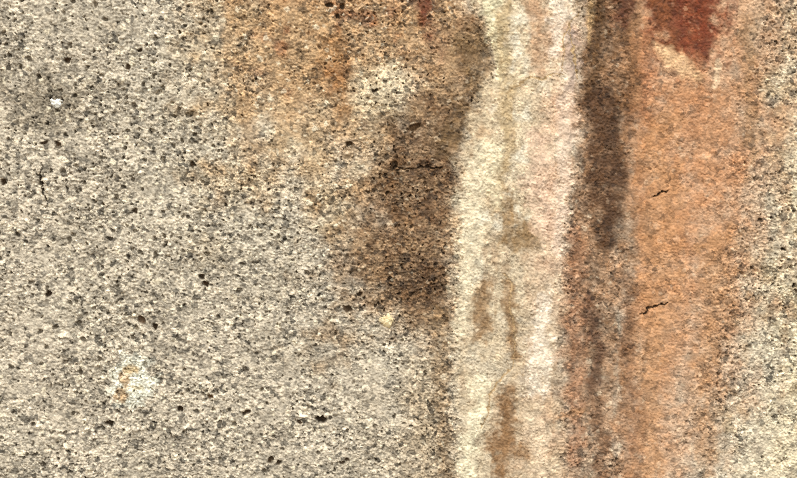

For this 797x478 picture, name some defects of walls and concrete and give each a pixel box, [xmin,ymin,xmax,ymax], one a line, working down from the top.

water stain [313,0,663,478]
crack [639,302,669,316]
corrosion [628,0,797,478]